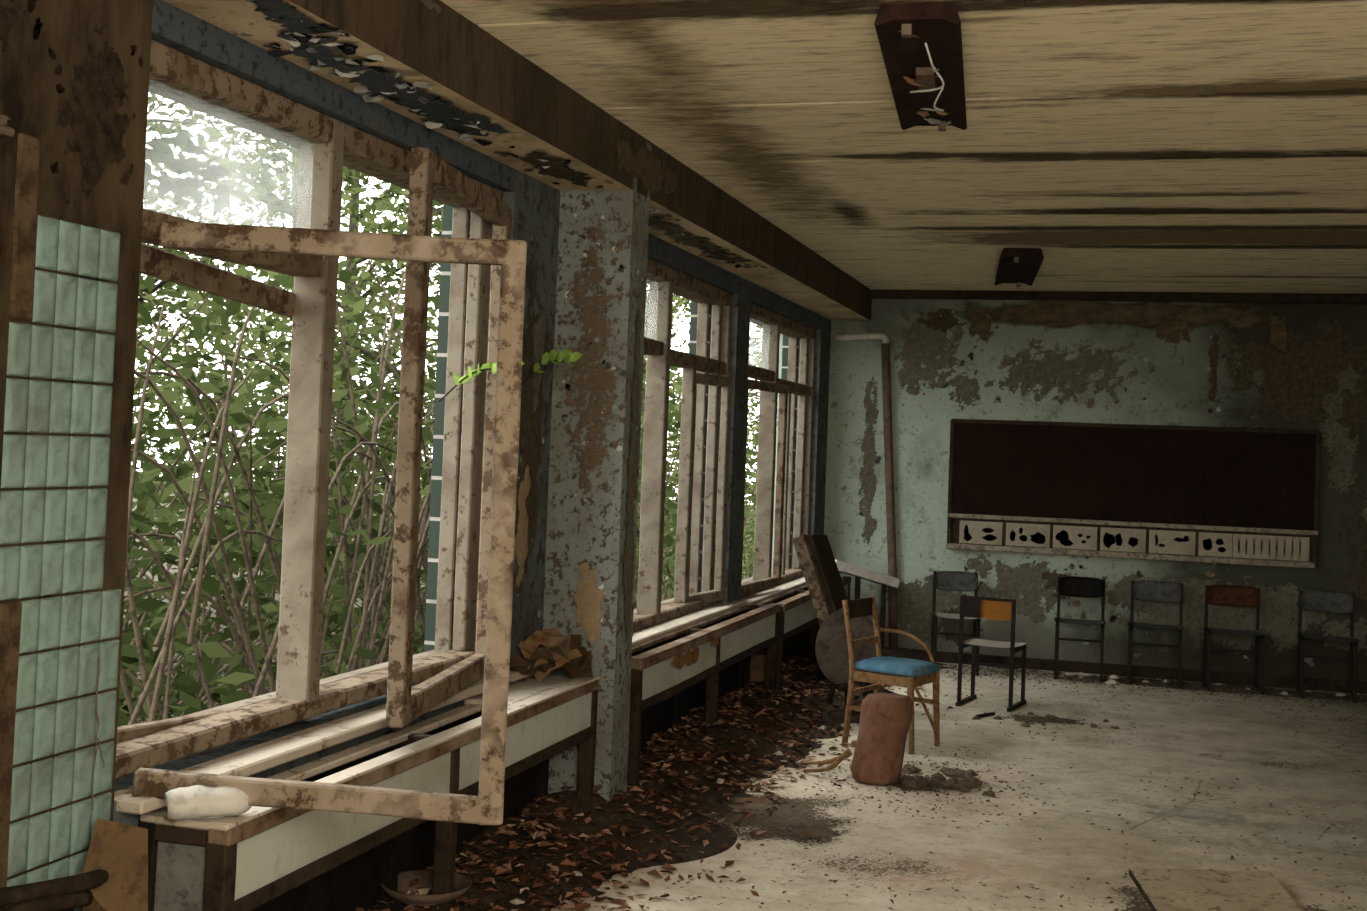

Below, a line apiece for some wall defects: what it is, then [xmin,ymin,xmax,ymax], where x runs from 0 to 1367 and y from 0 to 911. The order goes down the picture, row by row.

peeling [247,0,613,188]
leakage [533,0,1367,225]
peeling [881,306,1150,410]
peeling [1206,334,1221,413]
peeling [855,376,882,555]
peeling [887,554,1367,667]